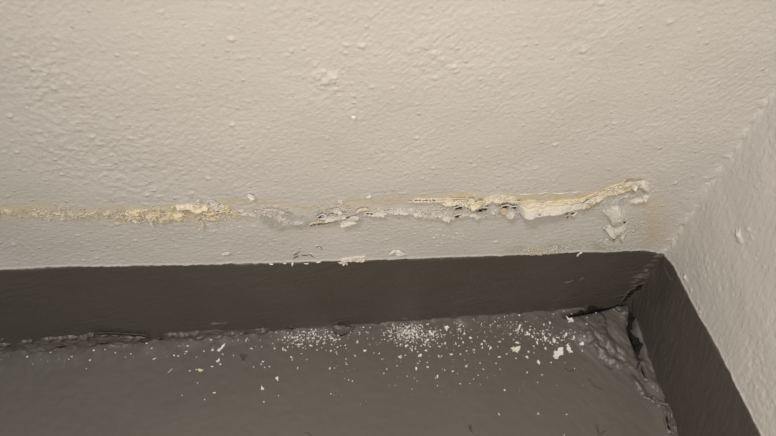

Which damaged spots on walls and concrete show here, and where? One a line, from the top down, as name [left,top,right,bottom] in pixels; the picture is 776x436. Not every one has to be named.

peeling [120,198,242,230]
spalling [309,200,364,228]
leakage [0,172,684,253]
peeling [407,180,657,220]
leakage [497,239,577,257]